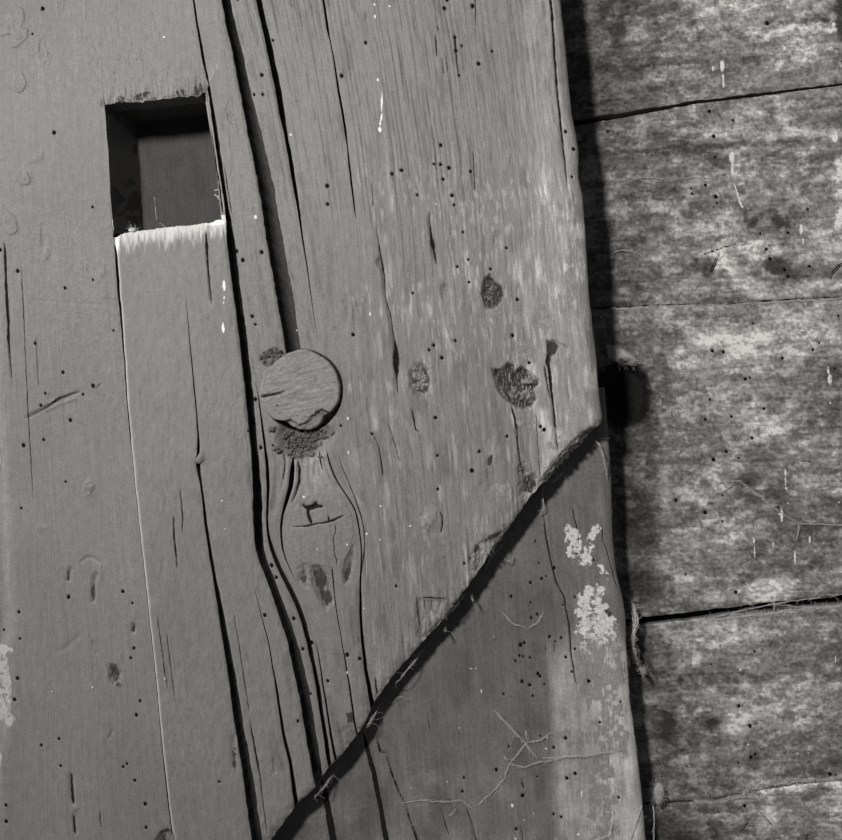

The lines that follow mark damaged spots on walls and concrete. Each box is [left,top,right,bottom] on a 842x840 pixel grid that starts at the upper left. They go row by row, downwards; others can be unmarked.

crack [4,243,101,497]
crack [193,0,418,840]